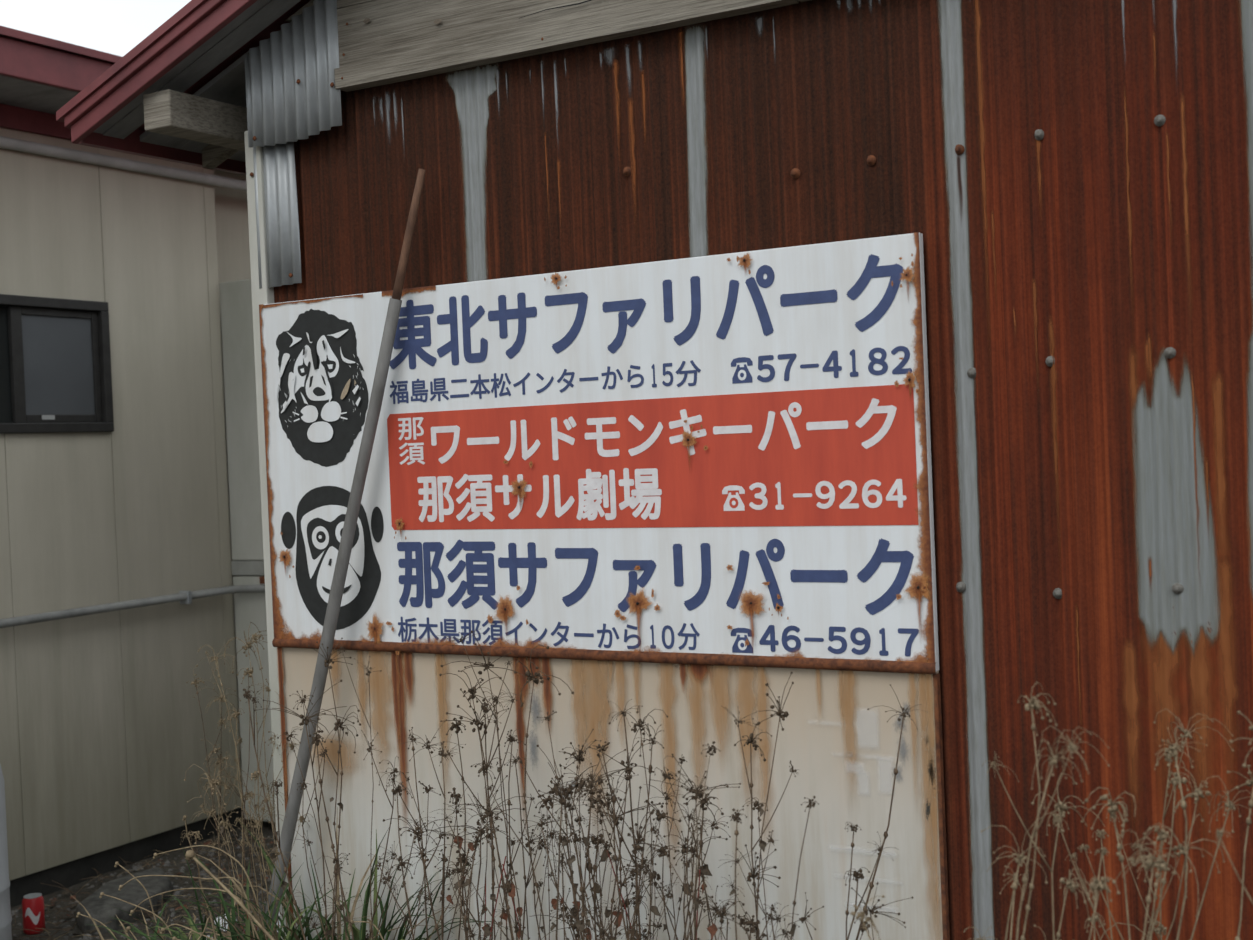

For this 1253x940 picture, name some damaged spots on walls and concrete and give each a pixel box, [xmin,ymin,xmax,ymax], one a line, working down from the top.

corrosion [614,60,646,200]
corrosion [975,0,996,294]
corrosion [727,253,752,274]
corrosion [891,232,936,672]
peeling [1133,349,1220,653]
corrosion [361,614,394,645]
corrosion [391,638,457,804]
corrosion [473,585,584,793]
corrosion [614,589,660,653]
corrosion [740,582,789,646]
corrosion [834,658,856,768]
corrosion [1124,374,1238,817]